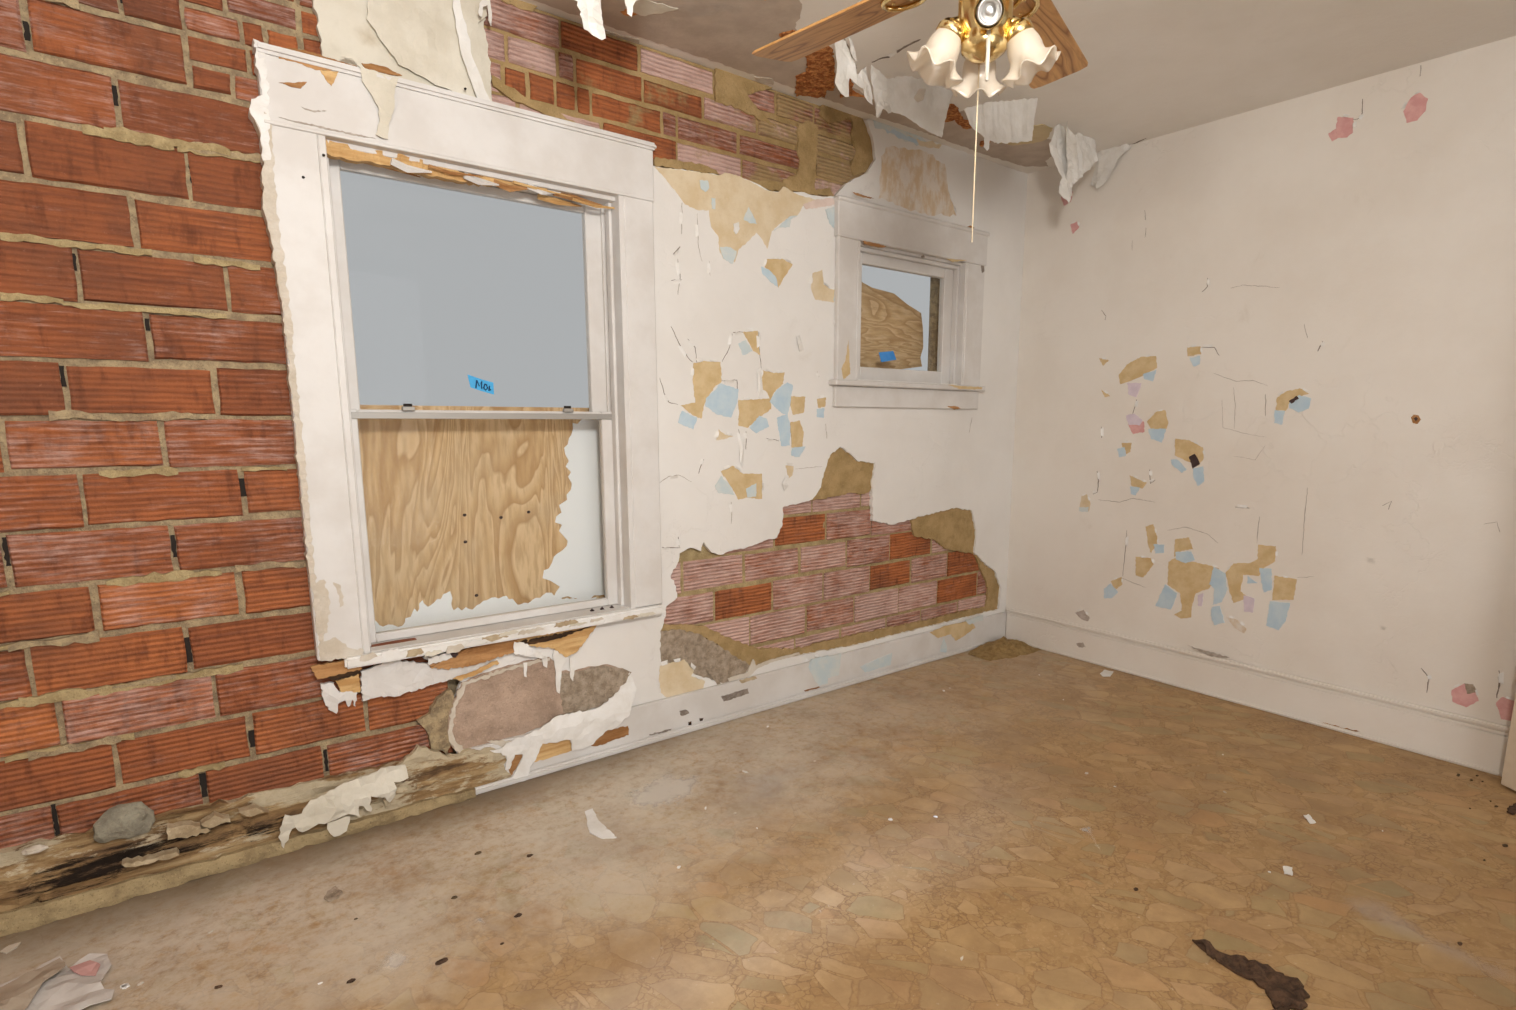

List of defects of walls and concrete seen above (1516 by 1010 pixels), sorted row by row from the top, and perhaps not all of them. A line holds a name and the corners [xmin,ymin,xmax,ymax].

flaking render [484,0,974,288]
peeling [809,270,835,302]
flaking render [0,0,638,849]
peeling [678,328,826,478]
peeling [841,341,850,379]
peeling [1099,355,1205,486]
peeling [1187,344,1203,366]
peeling [1274,388,1311,425]
peeling [1130,475,1147,495]
flaking render [649,447,999,735]
peeling [1104,524,1297,633]
peeling [1188,645,1230,658]